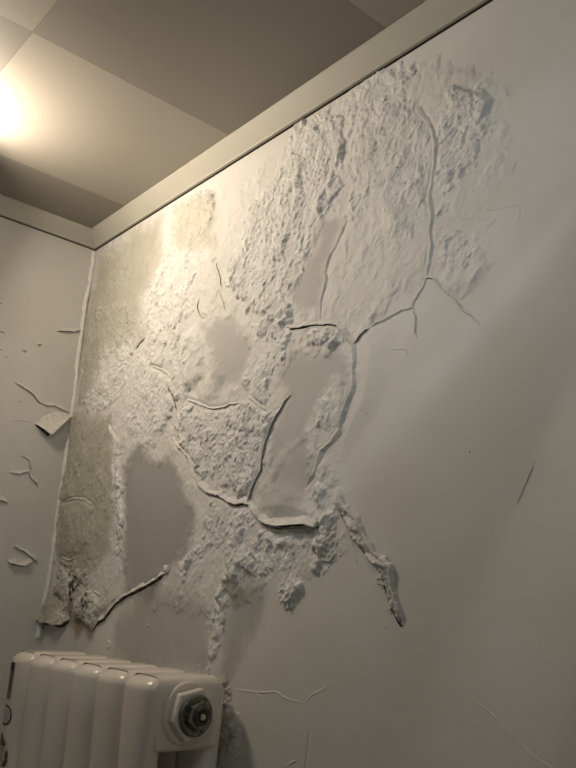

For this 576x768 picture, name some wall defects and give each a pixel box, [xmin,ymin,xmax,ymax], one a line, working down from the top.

crack [56,326,81,334]
crack [196,298,205,319]
crack [215,261,225,310]
crack [285,103,480,486]
peeling [110,60,432,675]
crack [13,382,70,422]
peeling [35,412,71,436]
crack [7,454,39,488]
crack [152,366,318,534]
crack [6,544,38,568]
flaking render [36,554,118,638]
flaking render [216,673,237,768]